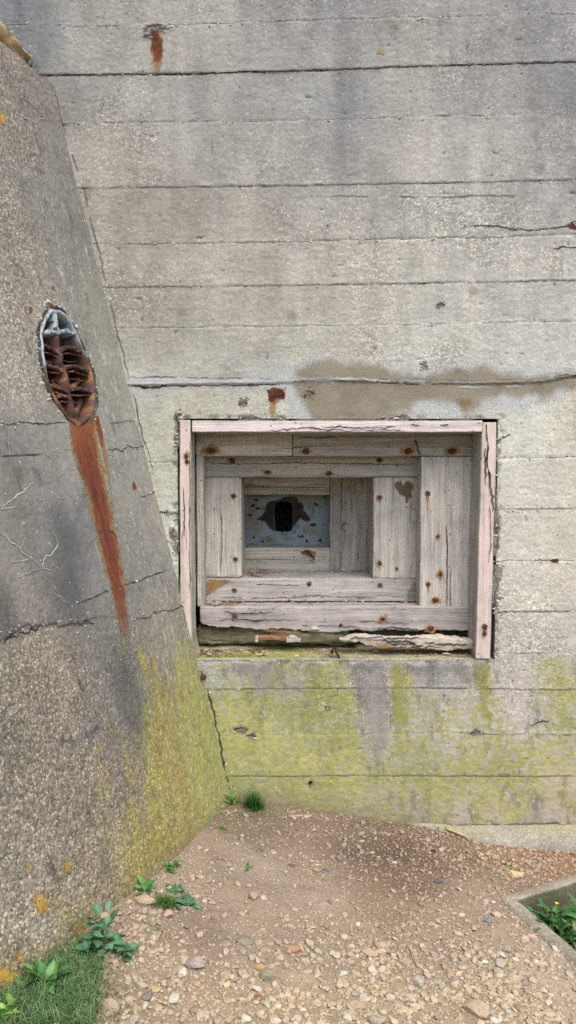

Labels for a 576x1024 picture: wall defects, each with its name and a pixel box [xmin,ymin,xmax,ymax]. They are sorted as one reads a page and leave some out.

rust [150,29,164,75]
crack [0,61,576,604]
rust [267,387,286,419]
water stain [294,359,576,421]
rust [60,377,127,624]
crack [131,605,183,621]
water stain [357,665,408,766]
crack [207,687,569,794]
crack [411,683,545,691]
water stain [473,660,491,718]